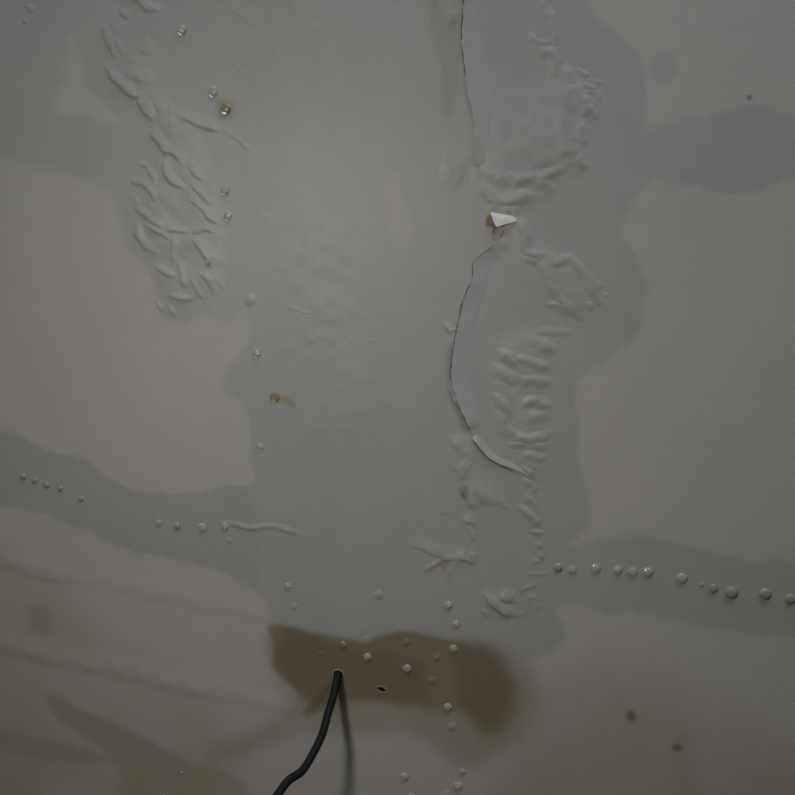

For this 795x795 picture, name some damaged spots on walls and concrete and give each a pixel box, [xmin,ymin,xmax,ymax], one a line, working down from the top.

leakage [0,0,568,795]
peeling [444,212,528,475]
leakage [471,0,795,642]
leakage [480,630,795,795]